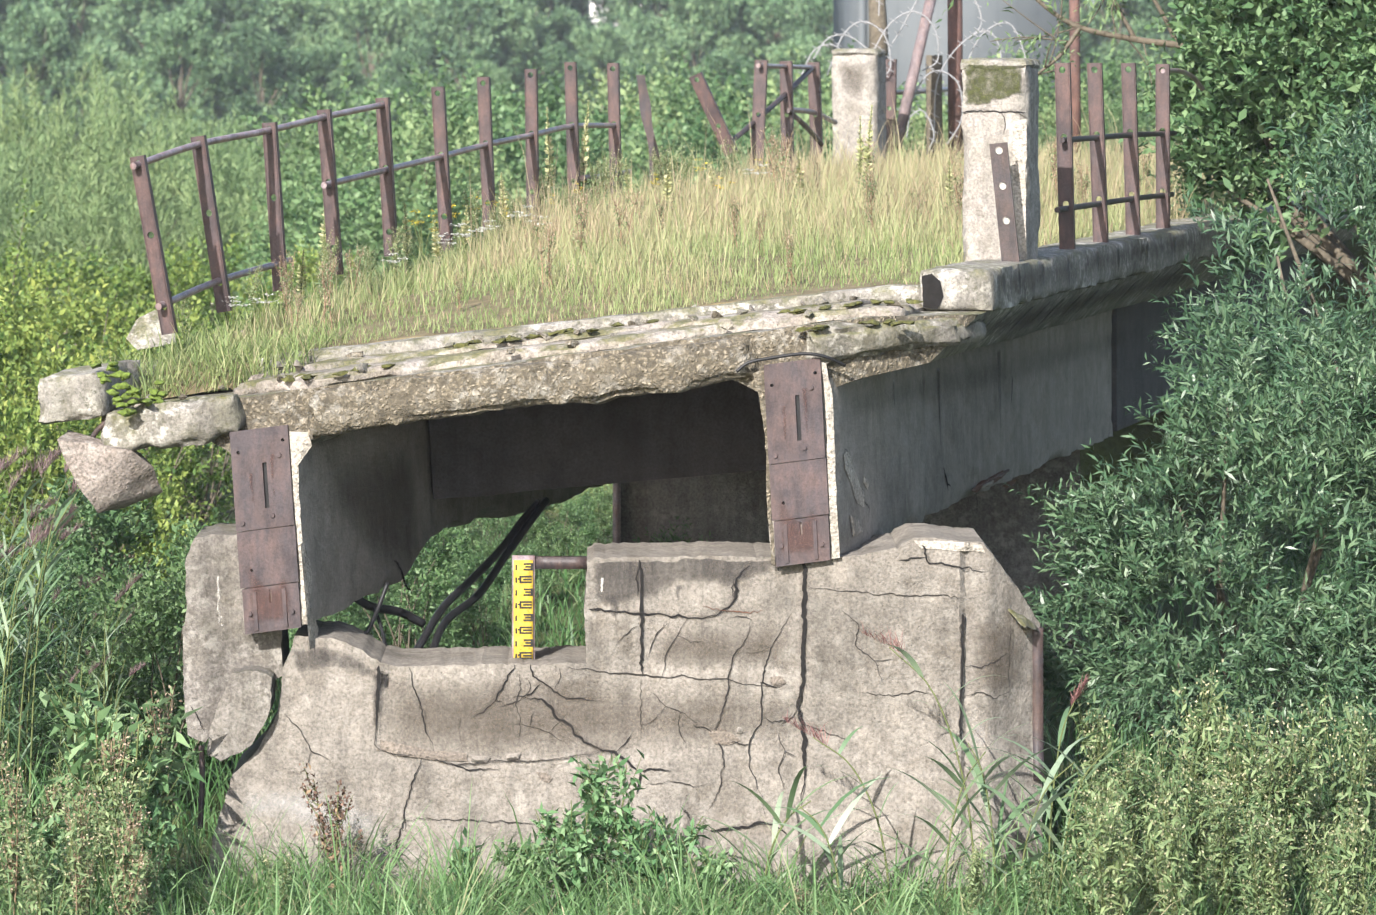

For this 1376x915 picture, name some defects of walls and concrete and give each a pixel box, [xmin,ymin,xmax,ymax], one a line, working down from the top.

spalling [101,394,246,452]
crack [374,545,1011,859]